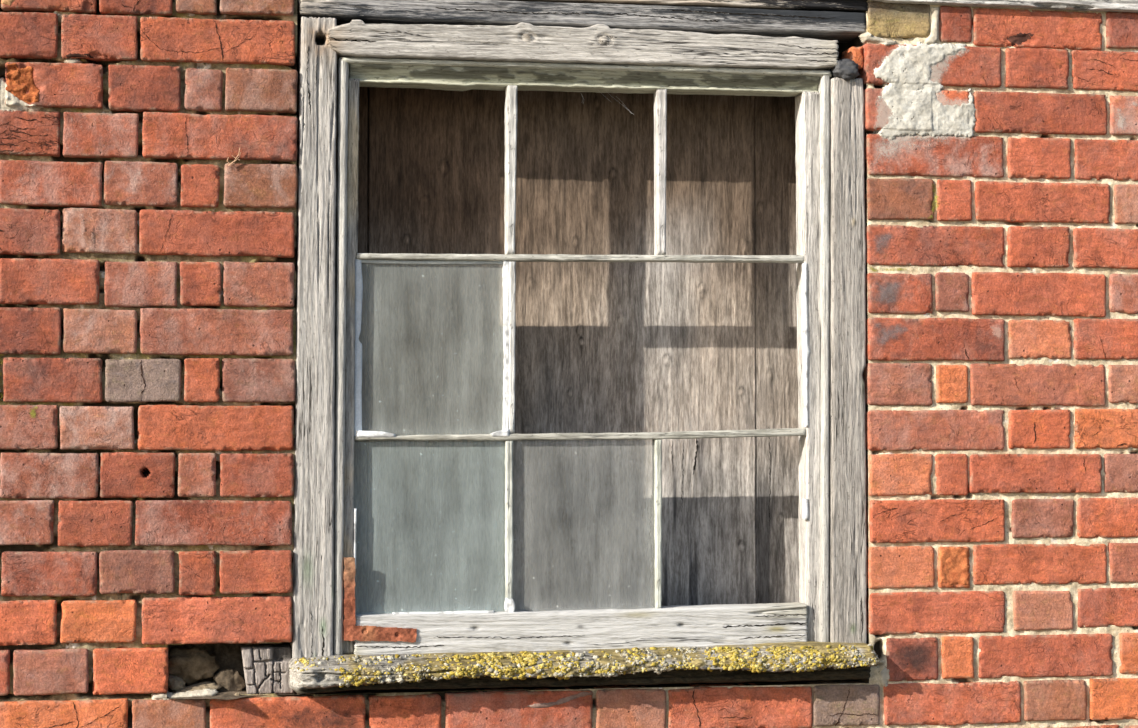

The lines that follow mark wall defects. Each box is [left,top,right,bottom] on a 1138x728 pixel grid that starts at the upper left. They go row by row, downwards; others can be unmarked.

spalling [5,63,40,103]
crack [829,688,878,726]